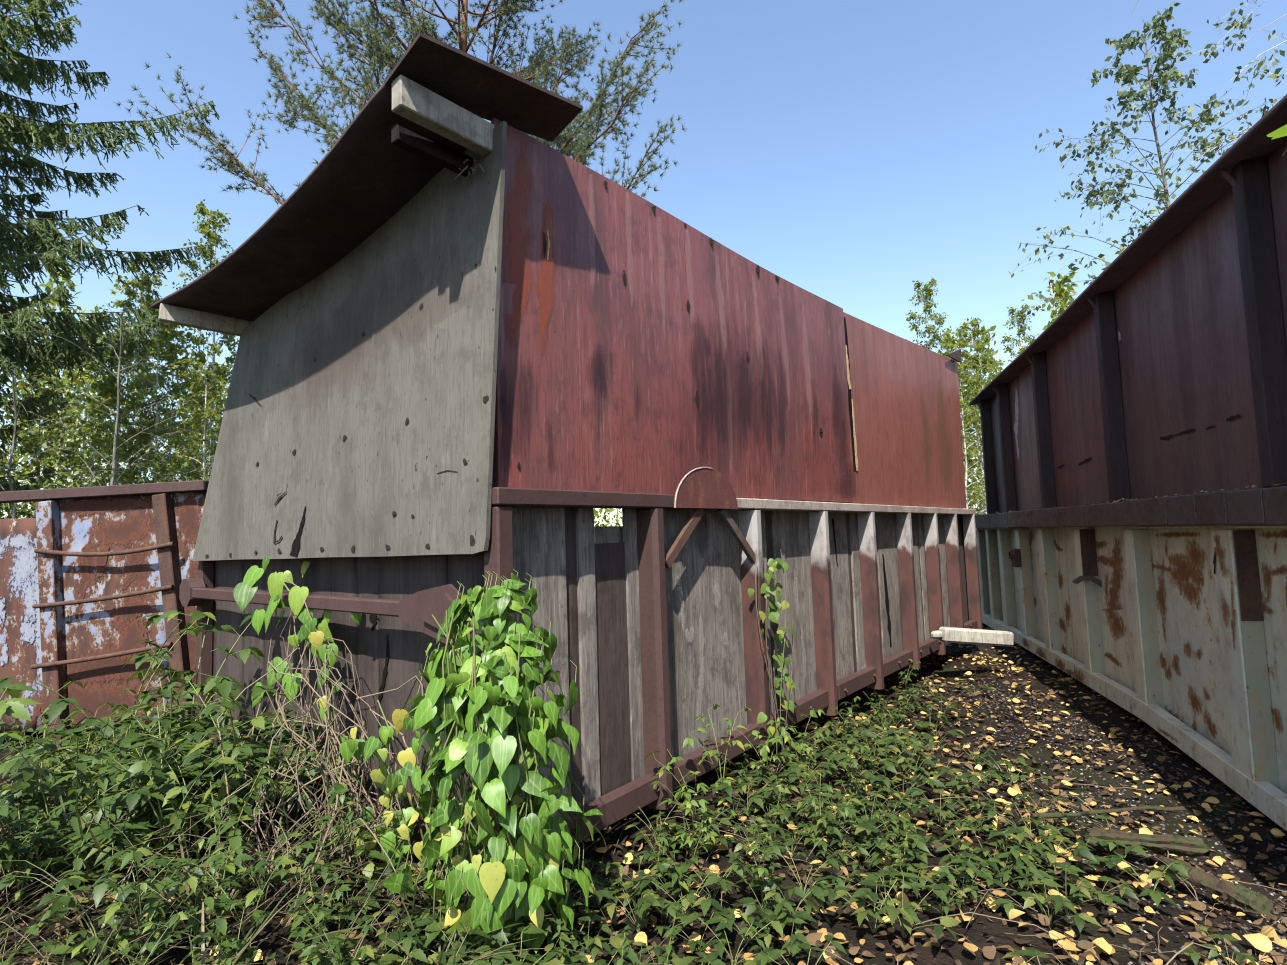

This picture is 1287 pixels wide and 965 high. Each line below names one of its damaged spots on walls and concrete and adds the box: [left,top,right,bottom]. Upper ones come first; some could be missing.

corrosion [503,147,553,343]
peeling [0,534,43,717]
corrosion [1023,571,1083,683]
corrosion [1095,538,1126,638]
corrosion [1151,532,1236,738]
corrosion [1259,530,1287,614]
corrosion [1271,708,1283,732]